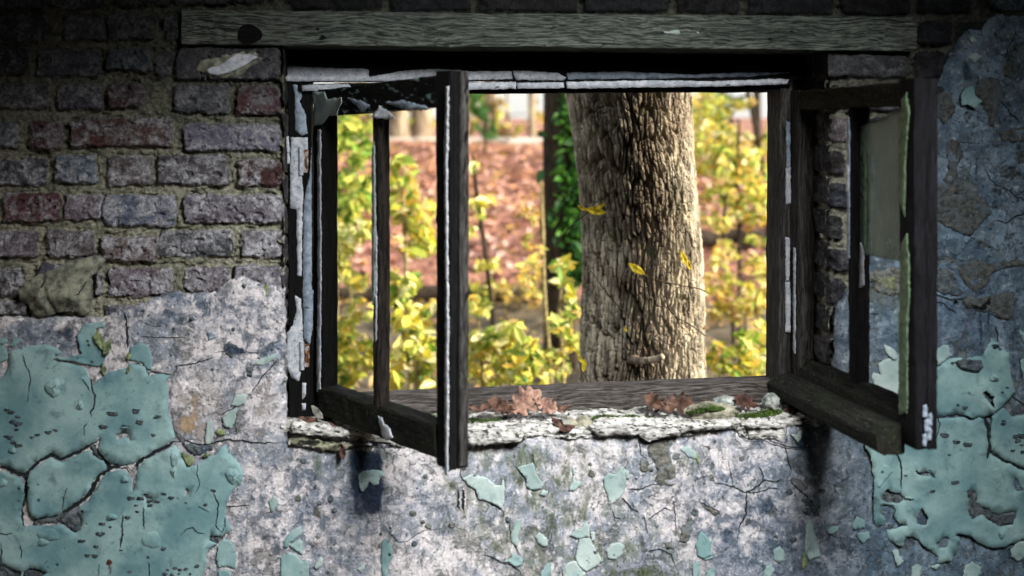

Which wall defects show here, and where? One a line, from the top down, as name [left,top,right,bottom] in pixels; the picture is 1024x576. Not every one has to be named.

peeling [207,53,257,76]
spalling [937,139,992,237]
spalling [937,259,1024,320]
peeling [0,321,247,576]
crack [0,312,284,573]
peeling [517,463,548,497]
peeling [540,521,625,576]
spalling [569,439,711,505]
crack [612,484,677,565]
peeling [665,503,720,576]
crack [698,428,820,543]
peeling [852,338,1024,576]